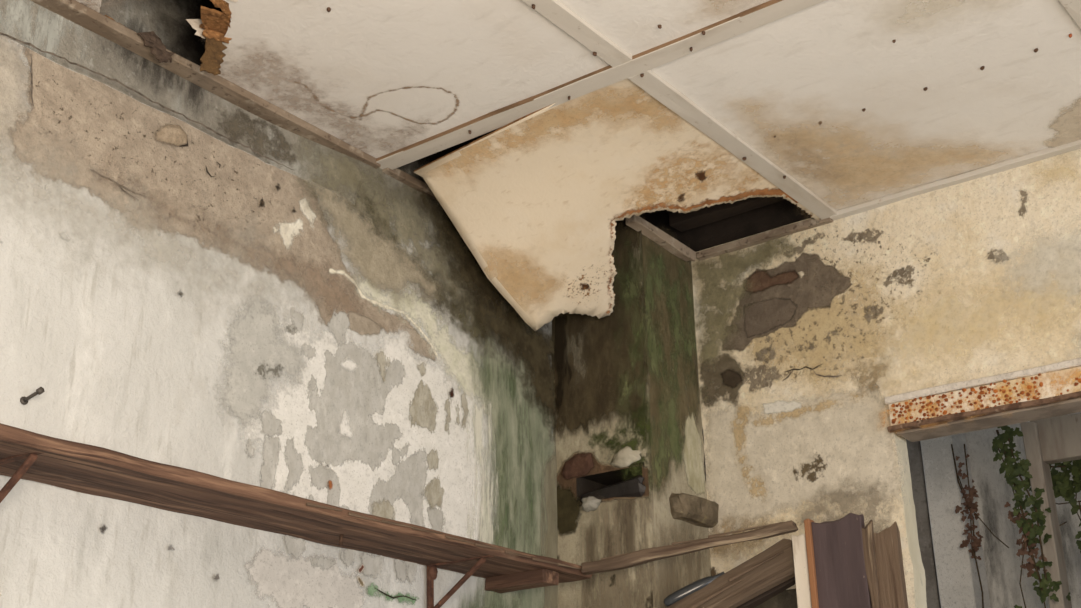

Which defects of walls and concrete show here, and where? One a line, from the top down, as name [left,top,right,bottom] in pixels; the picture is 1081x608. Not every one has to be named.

water stain [769,129,996,201]
peeling [0,35,496,542]
water stain [219,54,749,560]
peeling [722,228,932,391]
rust [883,371,1081,433]
water stain [582,500,767,608]